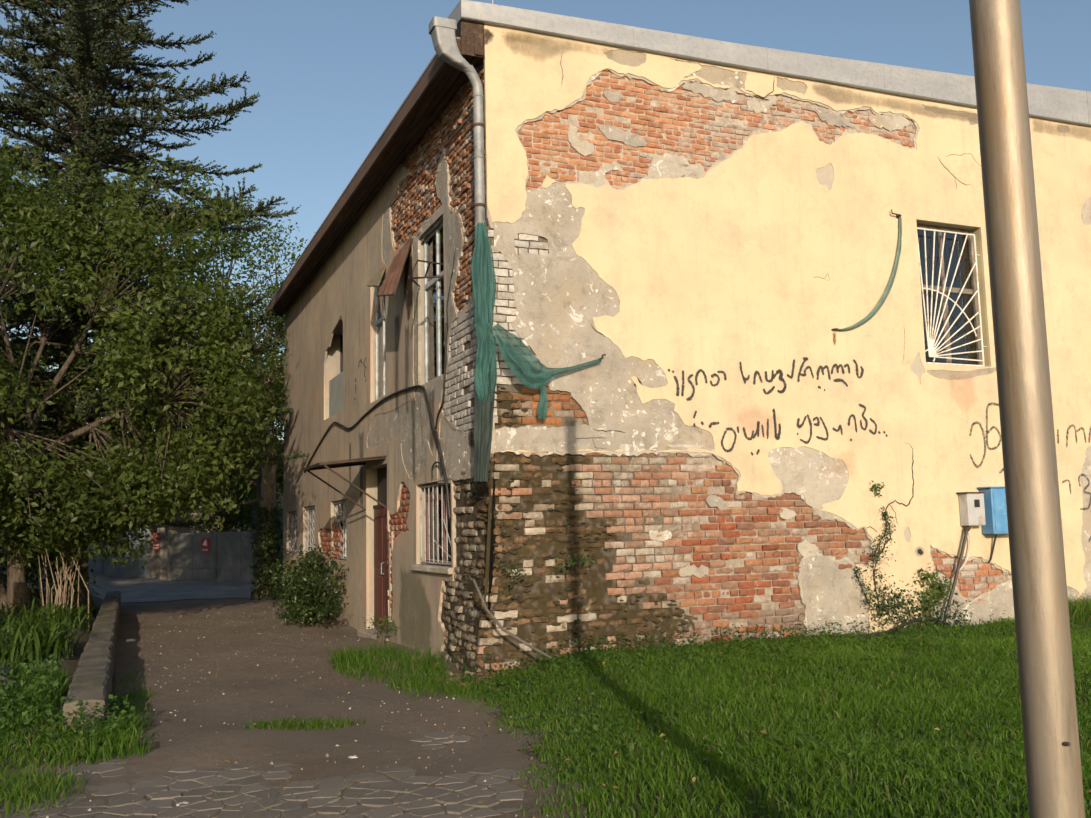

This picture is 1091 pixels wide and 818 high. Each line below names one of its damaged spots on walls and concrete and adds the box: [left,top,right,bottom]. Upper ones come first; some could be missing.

flaking render [922,104,978,125]
crack [938,153,981,188]
spalling [367,50,919,677]
crack [867,443,914,601]
spalling [904,527,1015,626]
flaking render [1067,446,1091,605]